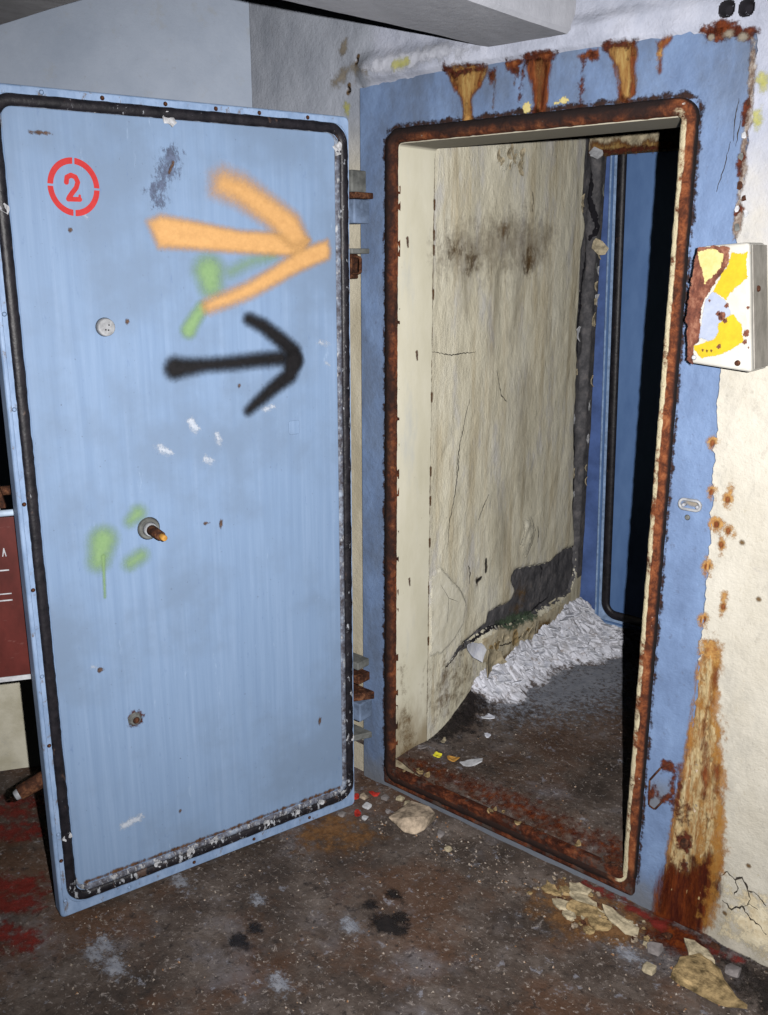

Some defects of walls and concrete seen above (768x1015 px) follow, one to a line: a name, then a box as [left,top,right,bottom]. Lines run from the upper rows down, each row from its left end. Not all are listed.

corrosion [383,36,705,403]
spalling [430,135,609,680]
corrosion [650,556,665,724]
corrosion [665,415,679,542]
corrosion [701,557,713,575]
corrosion [697,592,728,627]
corrosion [708,486,736,554]
corrosion [397,735,436,778]
corrosion [636,640,728,934]
crack [721,871,767,935]